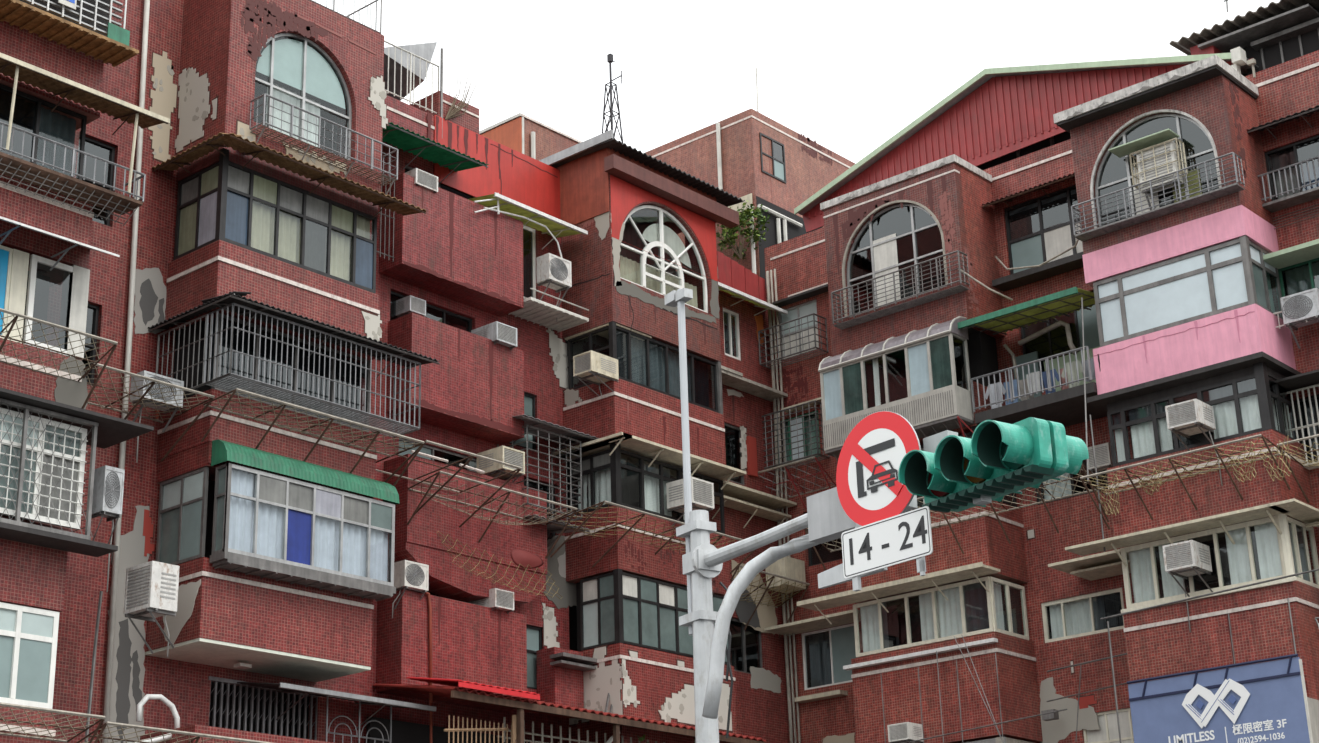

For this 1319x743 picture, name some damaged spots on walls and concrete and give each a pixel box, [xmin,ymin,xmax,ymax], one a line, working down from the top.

peeling [147,50,218,163]
peeling [235,119,256,142]
peeling [367,75,389,129]
peeling [133,268,167,334]
peeling [569,644,641,726]
peeling [658,683,695,726]
peeling [718,682,733,733]